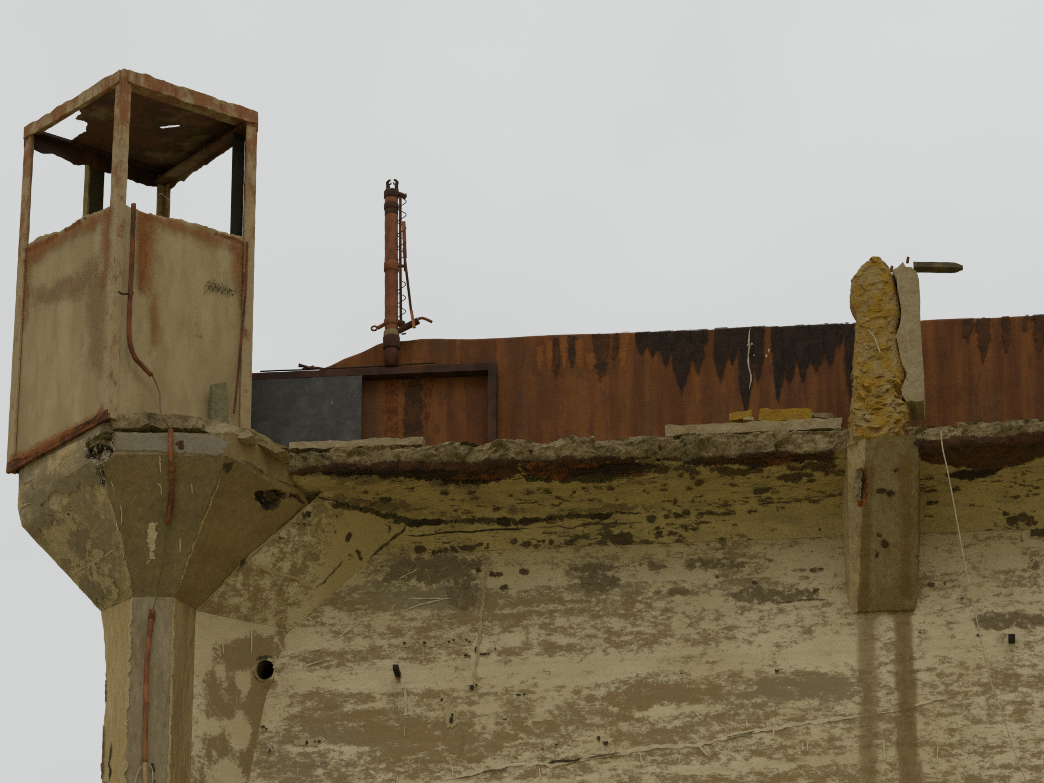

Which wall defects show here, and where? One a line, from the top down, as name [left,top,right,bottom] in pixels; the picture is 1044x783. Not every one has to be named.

corrosion [25,211,108,267]
corrosion [139,211,244,292]
corrosion [537,331,629,382]
corrosion [385,378,434,439]
spalling [286,427,850,476]
spalling [899,395,1044,453]
spalling [255,490,306,510]
damp [331,488,415,526]
flaking render [20,431,133,735]
crack [441,698,948,781]